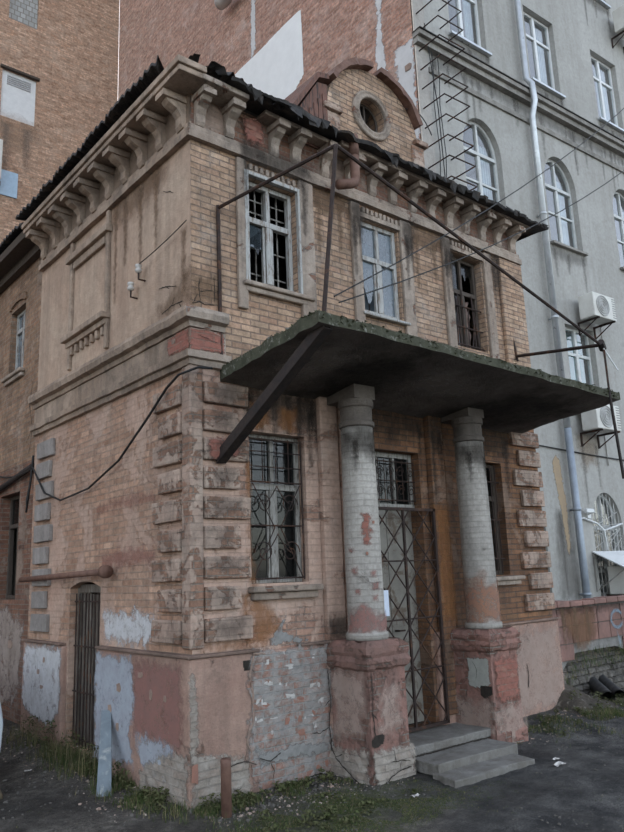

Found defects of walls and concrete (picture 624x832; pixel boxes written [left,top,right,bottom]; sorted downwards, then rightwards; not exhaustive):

flaking render [394,38,418,106]
peeling [361,513,375,555]
peeling [0,606,61,726]
peeling [102,606,154,646]
flaking render [93,643,416,810]
flaking render [496,627,564,738]